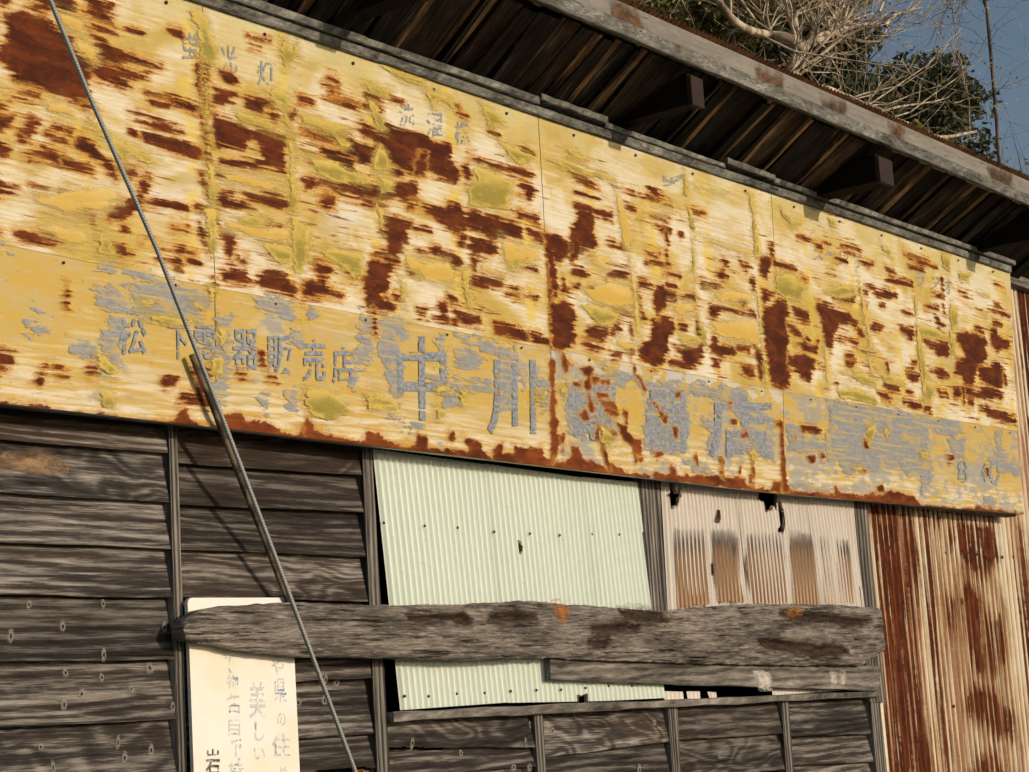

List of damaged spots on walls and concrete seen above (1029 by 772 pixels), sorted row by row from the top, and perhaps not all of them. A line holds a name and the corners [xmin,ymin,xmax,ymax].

peeling [60,14,99,60]
peeling [0,453,59,475]
peeling [34,186,236,408]
peeling [191,10,351,274]
peeling [253,291,320,349]
peeling [255,384,352,420]
peeling [311,148,393,230]
peeling [348,307,426,435]
rust [0,0,1029,459]
peeling [580,193,641,350]
peeling [425,279,967,495]
rust [224,359,1029,772]